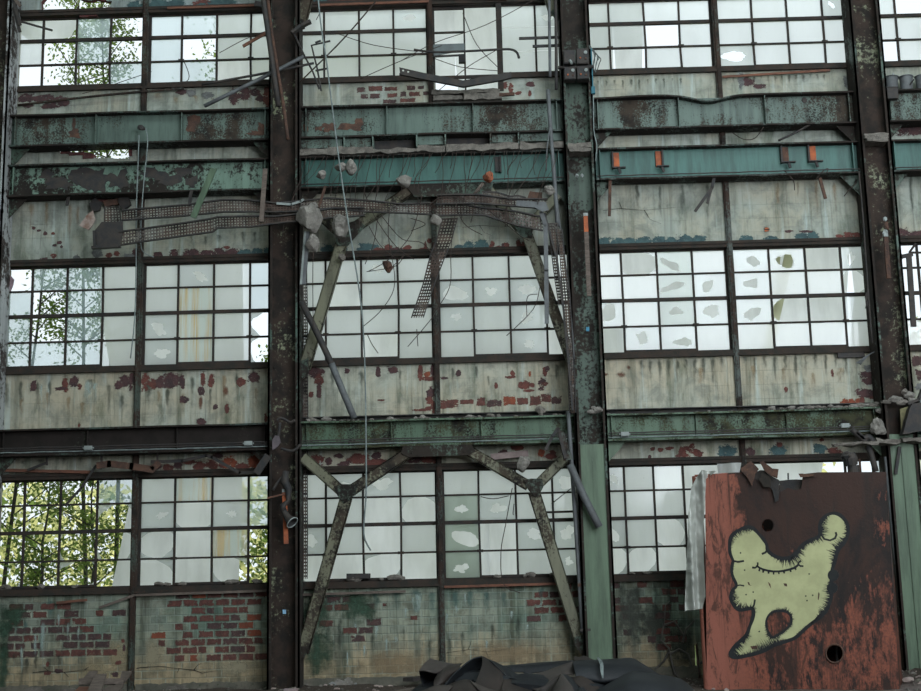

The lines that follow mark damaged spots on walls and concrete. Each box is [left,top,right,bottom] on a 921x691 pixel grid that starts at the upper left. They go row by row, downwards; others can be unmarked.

flaking render [357,85,428,104]
peeling [504,81,535,96]
peeling [55,376,82,393]
peeling [114,371,189,403]
peeling [198,371,215,396]
peeling [236,371,260,387]
peeling [308,367,325,398]
peeling [375,365,398,377]
flaking render [411,364,561,413]
flaking render [911,356,921,391]